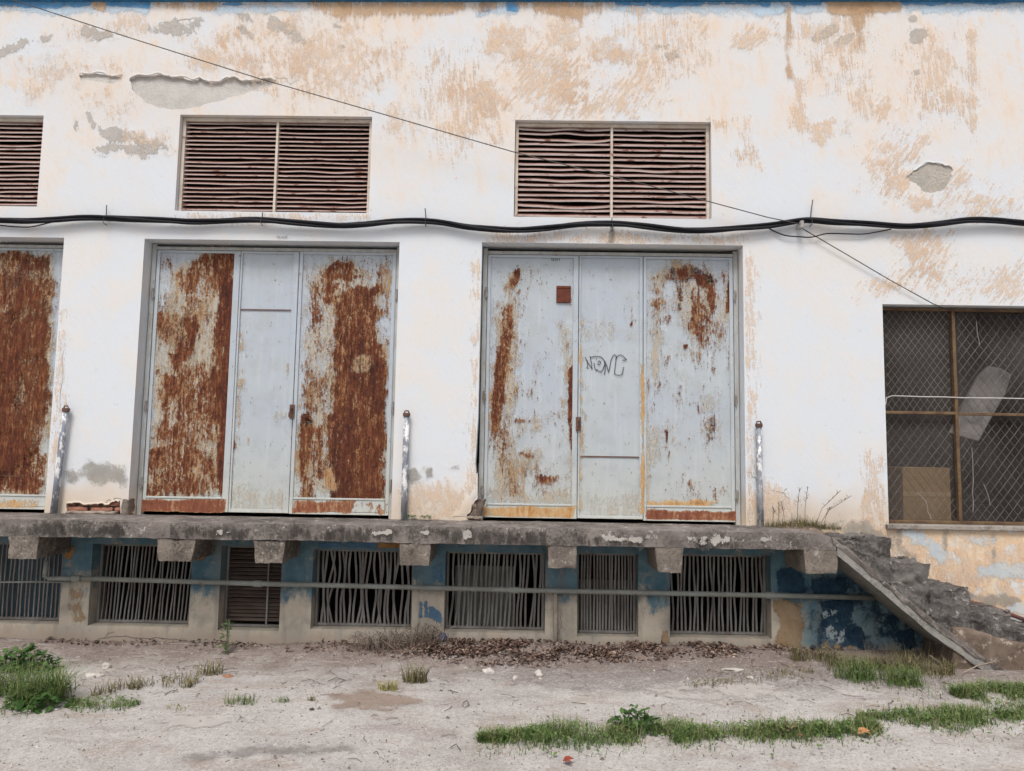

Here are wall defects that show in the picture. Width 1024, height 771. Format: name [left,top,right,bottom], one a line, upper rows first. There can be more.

peeling [98,114,168,160]
spalling [25,2,408,110]
peeling [411,2,1024,217]
corrosion [0,242,60,508]
corrosion [139,245,395,515]
corrosion [483,259,739,521]
spalling [66,499,120,515]
water stain [66,463,125,483]
peeling [773,567,922,650]
peeling [977,562,1024,580]